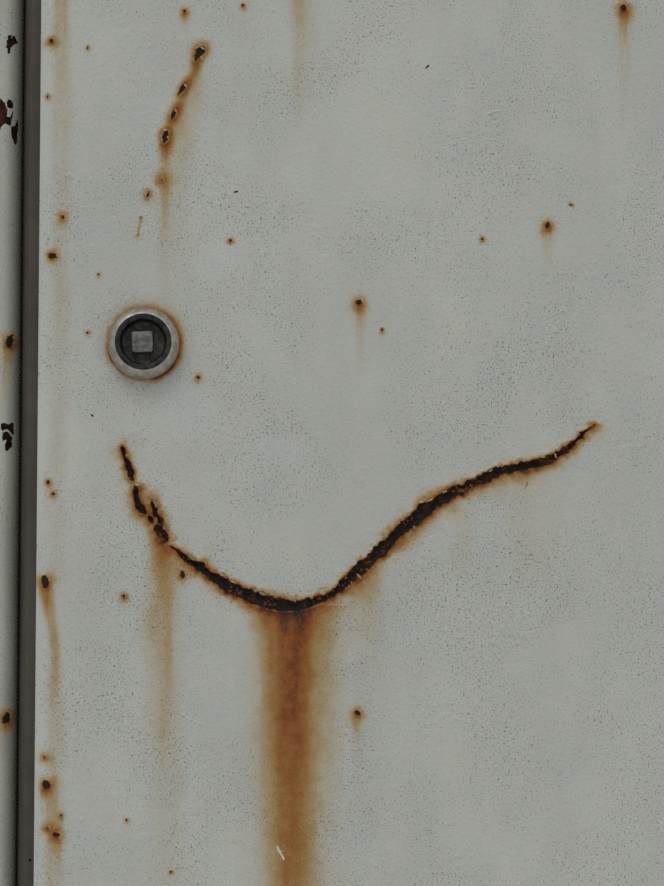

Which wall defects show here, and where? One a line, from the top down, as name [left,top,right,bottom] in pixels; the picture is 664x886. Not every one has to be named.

peeling [6,35,18,54]
rust [607,0,644,119]
peeling [0,99,18,145]
rust [535,211,562,271]
rust [343,287,389,380]
peeling [1,423,14,451]
rust [34,0,207,886]
crack [104,405,614,616]
rust [0,700,18,759]
rust [228,561,389,886]